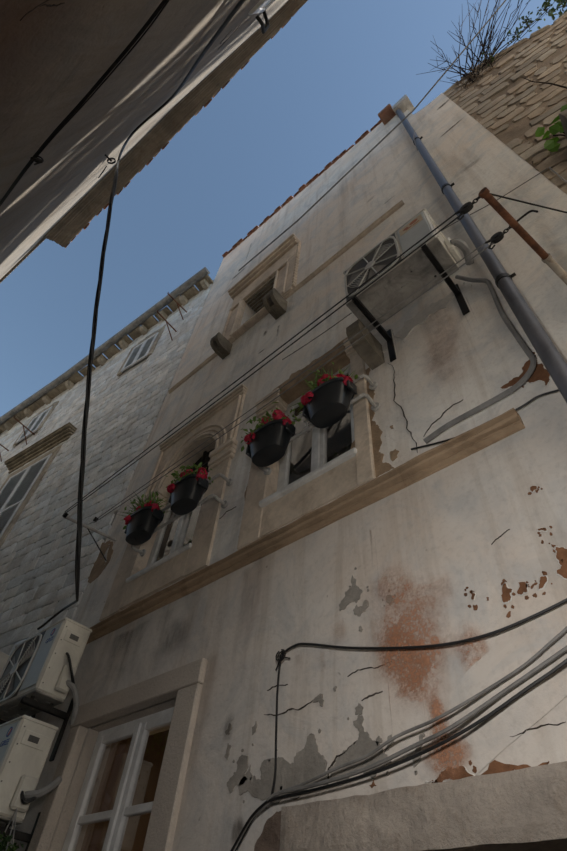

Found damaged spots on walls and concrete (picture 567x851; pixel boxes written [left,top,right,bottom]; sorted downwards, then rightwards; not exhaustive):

peeling [365,367,399,478]
crack [388,363,463,453]
peeling [500,349,551,390]
peeling [339,567,369,632]
spalling [501,526,567,618]
crack [264,701,313,716]
peeling [225,703,394,851]
corrosion [383,583,465,775]
spalling [425,760,549,783]
crack [510,722,566,737]